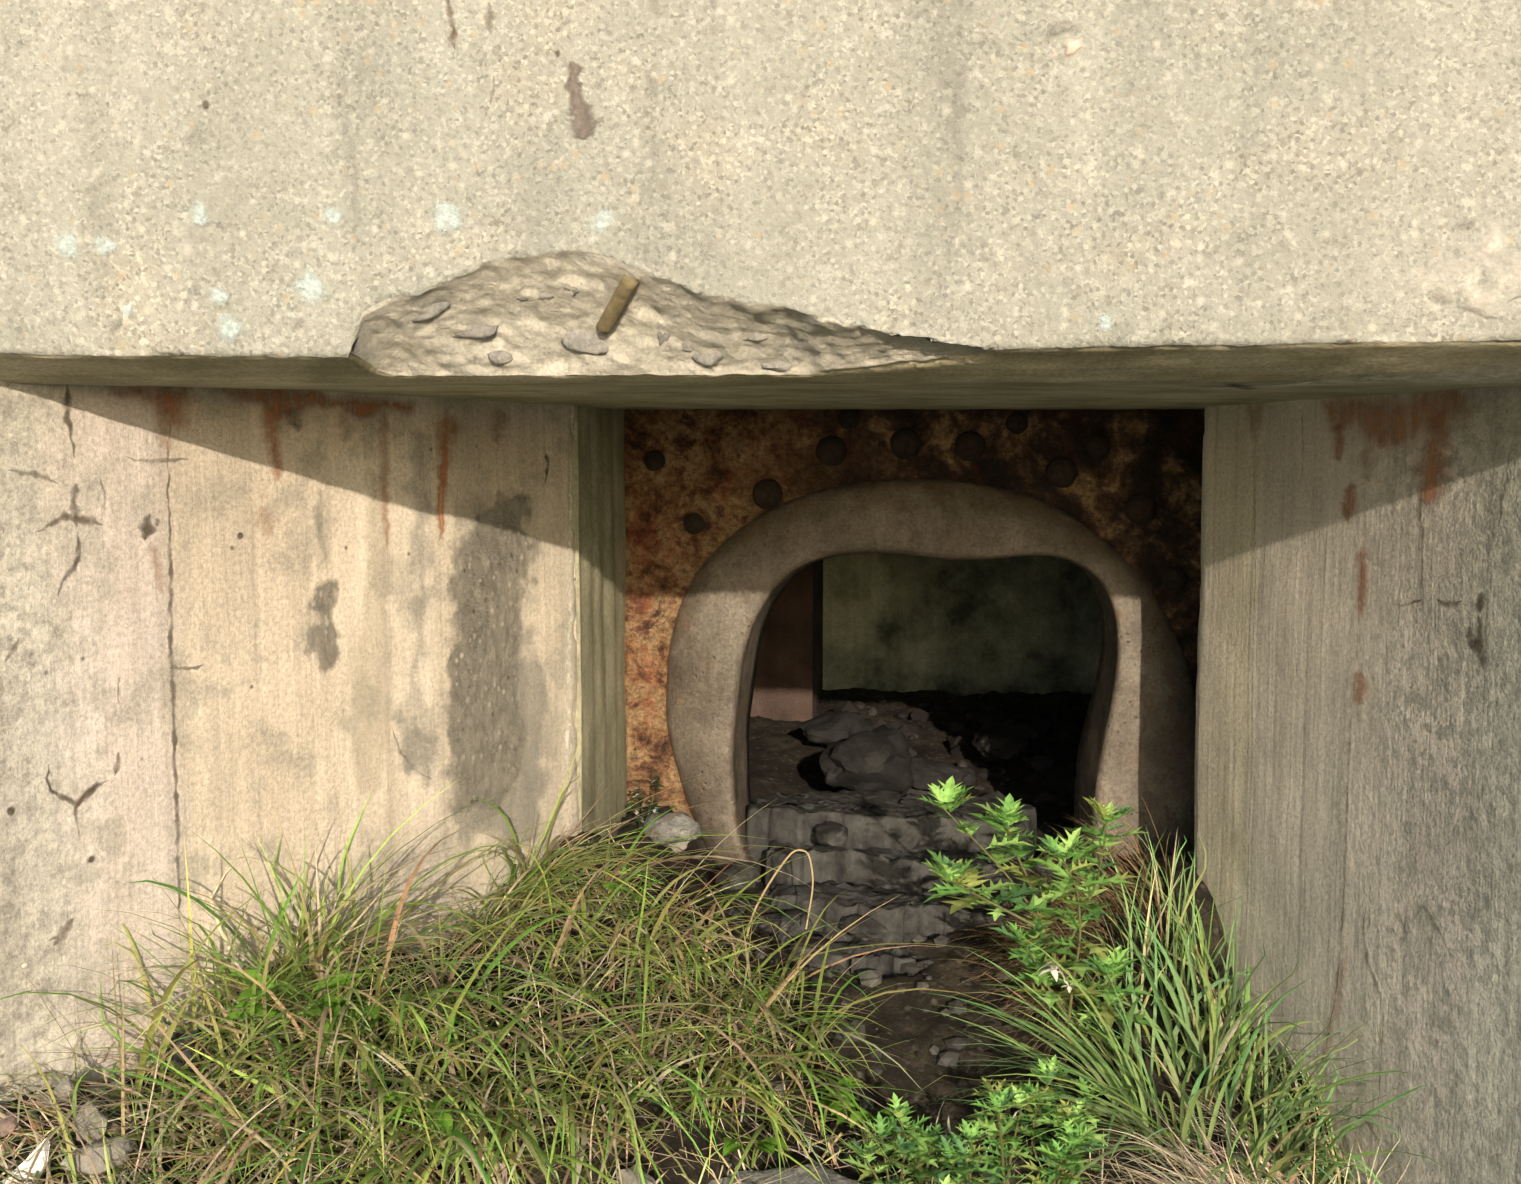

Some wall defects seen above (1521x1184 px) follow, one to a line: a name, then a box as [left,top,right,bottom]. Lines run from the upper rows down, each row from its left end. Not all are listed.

crack [8,388,105,594]
rust [229,389,412,478]
rust [437,418,457,535]
crack [131,419,202,933]
crack [45,769,100,821]